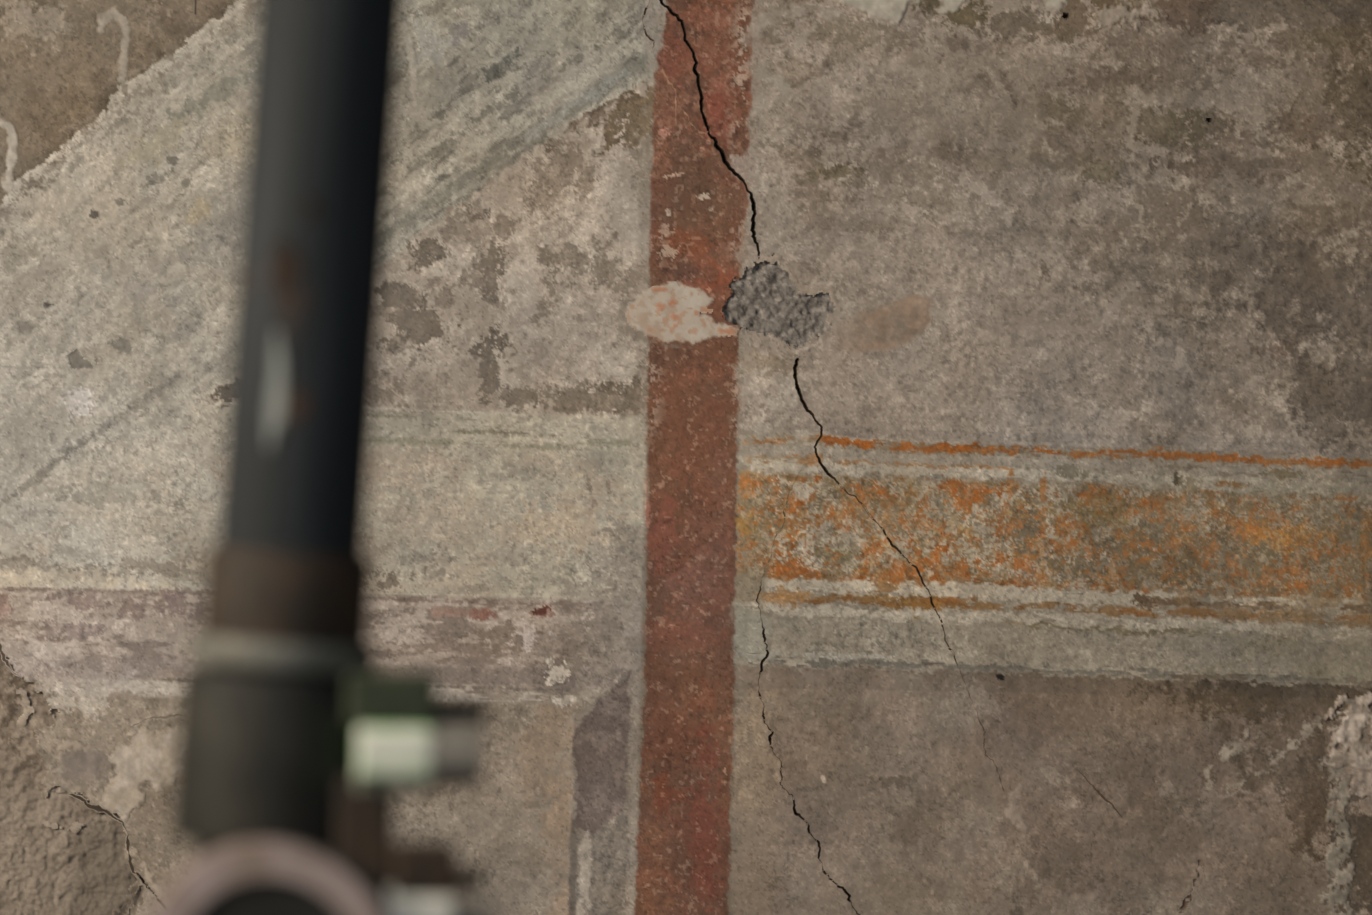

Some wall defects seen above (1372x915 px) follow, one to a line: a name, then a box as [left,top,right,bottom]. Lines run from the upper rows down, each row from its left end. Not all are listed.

crack [640,0,763,259]
spalling [625,252,934,355]
crack [744,355,1007,915]
crack [134,861,164,903]
leakage [1202,690,1372,915]